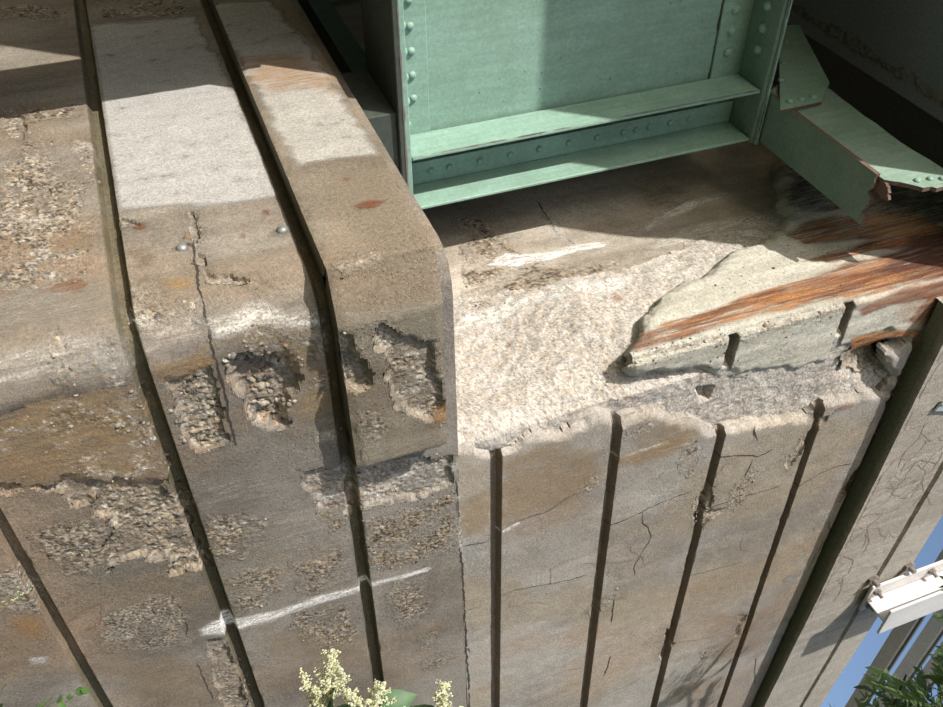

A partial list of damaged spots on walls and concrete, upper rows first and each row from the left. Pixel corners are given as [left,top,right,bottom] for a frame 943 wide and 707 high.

peeling [0,104,104,297]
crack [191,240,237,446]
spalling [0,206,900,629]
crack [509,353,943,623]
corrosion [635,214,943,349]
peeling [95,592,254,707]
peeling [288,601,362,651]